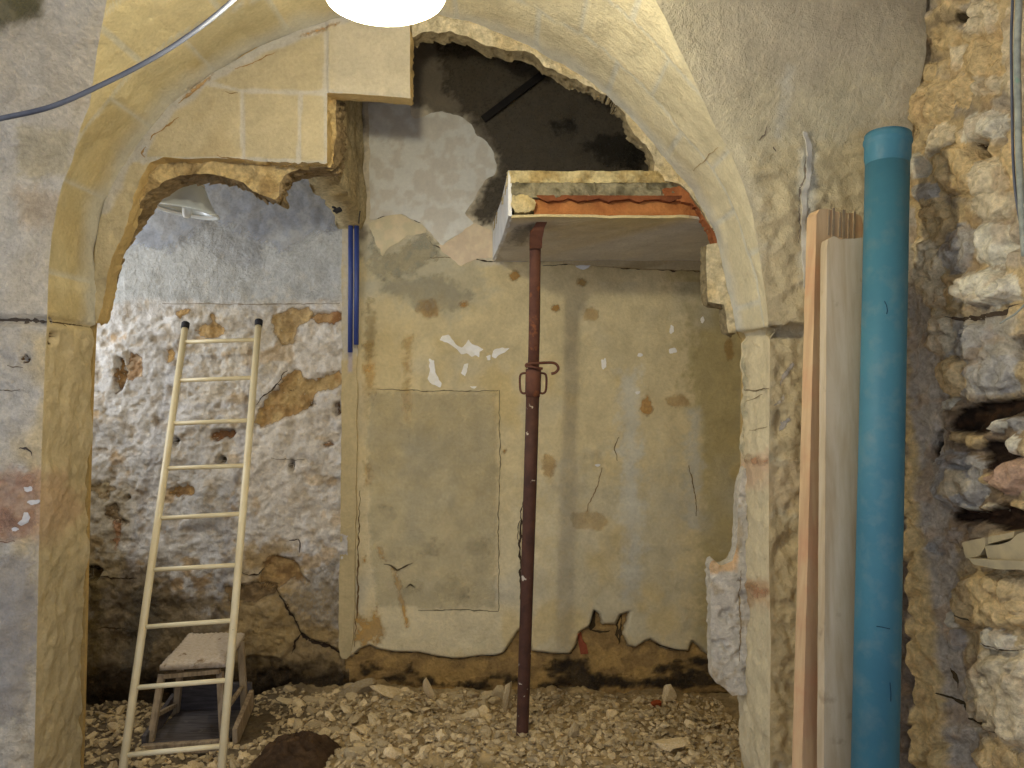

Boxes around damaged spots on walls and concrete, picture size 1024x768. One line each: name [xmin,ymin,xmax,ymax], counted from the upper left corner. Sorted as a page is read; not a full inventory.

peeling [368,102,497,266]
spalling [199,314,225,338]
spalling [271,307,342,345]
spalling [254,370,342,427]
peeling [428,359,442,387]
peeling [440,335,509,389]
crack [587,437,619,511]
crack [242,491,361,654]
water stain [458,674,518,690]
spalling [345,610,729,695]
water stain [538,657,727,693]